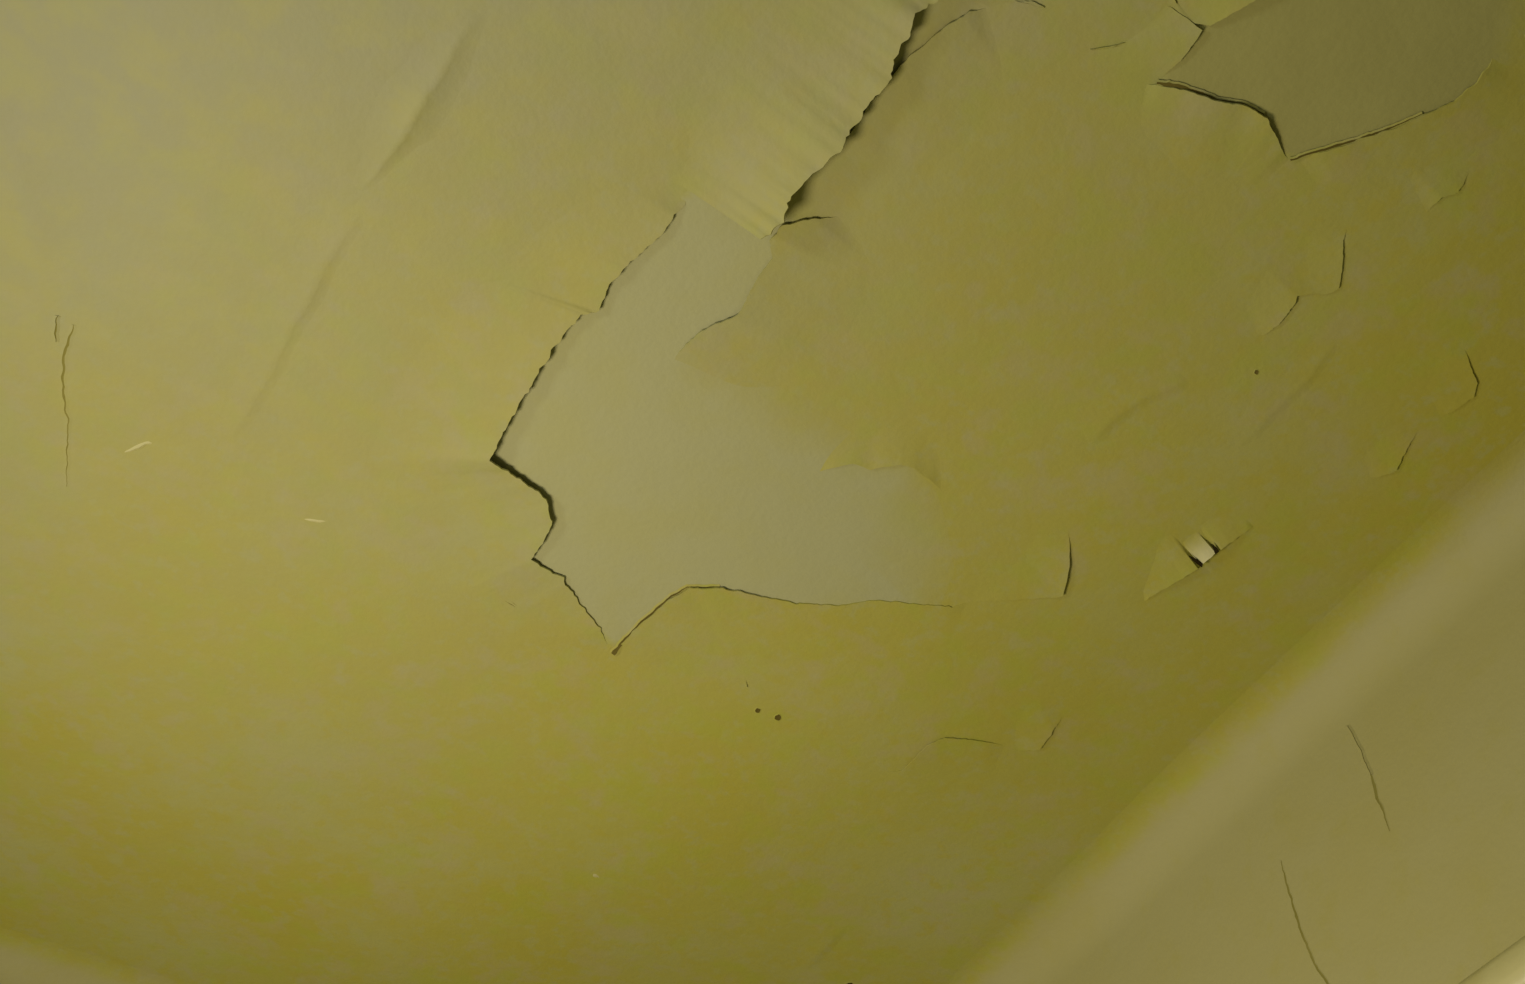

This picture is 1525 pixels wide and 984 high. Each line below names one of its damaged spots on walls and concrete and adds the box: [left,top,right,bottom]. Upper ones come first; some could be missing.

peeling [1090,0,1525,201]
crack [51,315,77,487]
peeling [367,0,1070,685]